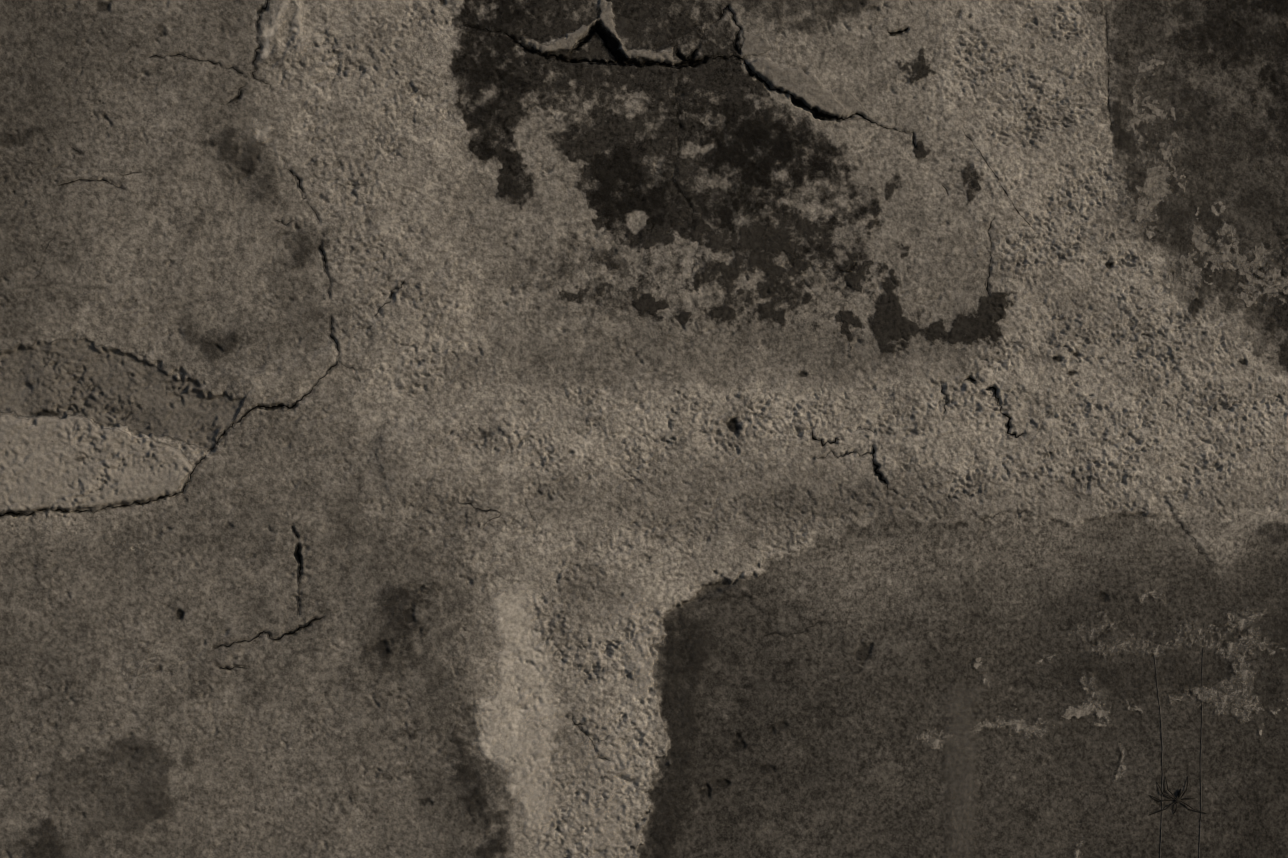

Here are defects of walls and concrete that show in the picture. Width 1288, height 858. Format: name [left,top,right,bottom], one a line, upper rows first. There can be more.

crack [0,157,353,517]
crack [149,0,272,105]
leakage [450,0,879,290]
crack [463,5,916,224]
leakage [1152,146,1245,317]
leakage [1110,0,1288,192]
leakage [1248,279,1288,371]
crack [217,527,323,670]
leakage [453,589,559,858]